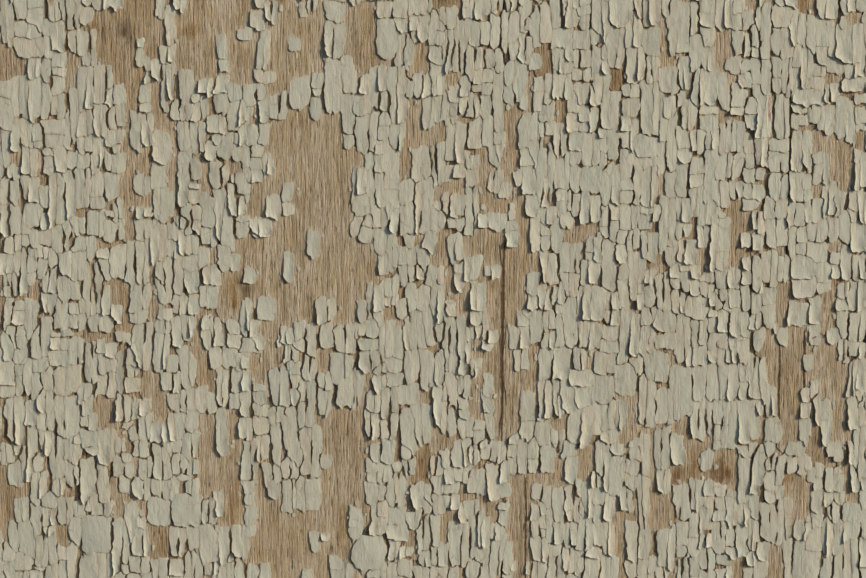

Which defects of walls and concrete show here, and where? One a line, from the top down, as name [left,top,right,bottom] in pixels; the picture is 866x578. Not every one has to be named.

peeling [0,425,41,578]
peeling [0,253,50,362]
peeling [0,0,56,203]
crack [0,0,312,578]
peeling [47,0,410,578]
crack [312,88,322,96]
crack [345,0,866,578]
peeling [383,0,866,578]